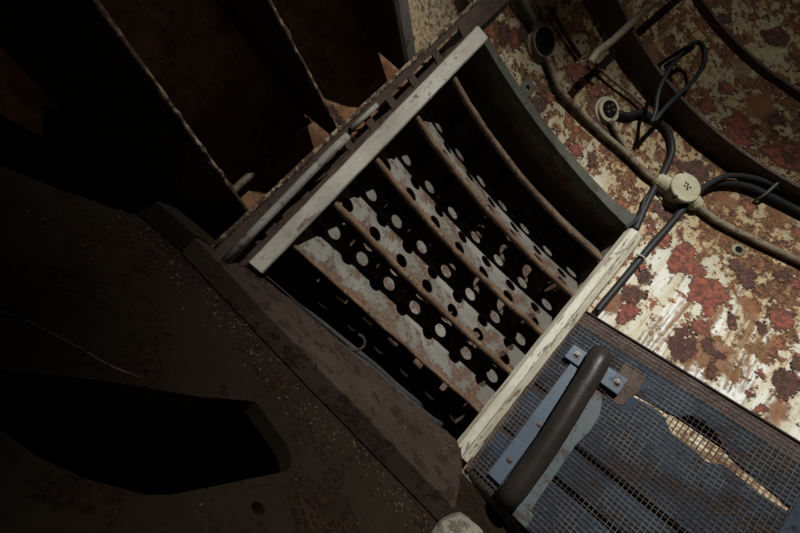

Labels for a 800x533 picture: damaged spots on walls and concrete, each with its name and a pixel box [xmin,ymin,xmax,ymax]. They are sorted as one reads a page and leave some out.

corrosion [453,0,469,14]
corrosion [761,24,792,48]
corrosion [586,116,609,168]
corrosion [672,158,713,186]
corrosion [767,207,793,224]
corrosion [605,265,658,314]
peeling [643,221,733,339]
peeling [615,301,643,326]
corrosion [639,257,777,392]
peeling [767,308,800,334]
peeling [744,387,770,415]
corrosion [764,353,800,424]